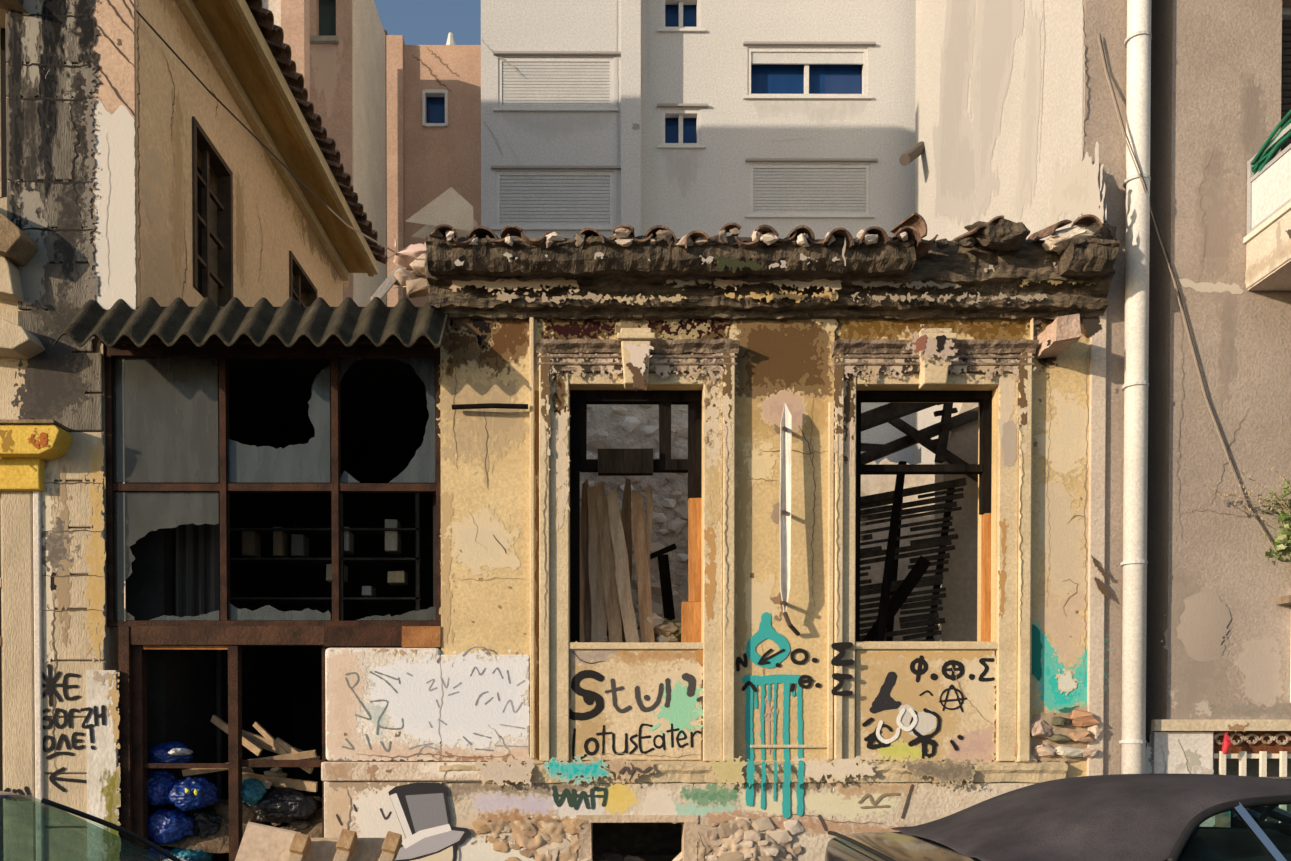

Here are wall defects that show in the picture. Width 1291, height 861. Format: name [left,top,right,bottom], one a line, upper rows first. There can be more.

peeling [450,253,1048,305]
peeling [811,319,840,336]
peeling [527,319,808,534]
peeling [831,320,1112,670]
peeling [440,502,521,589]
peeling [93,671,120,773]
spalling [450,805,592,861]